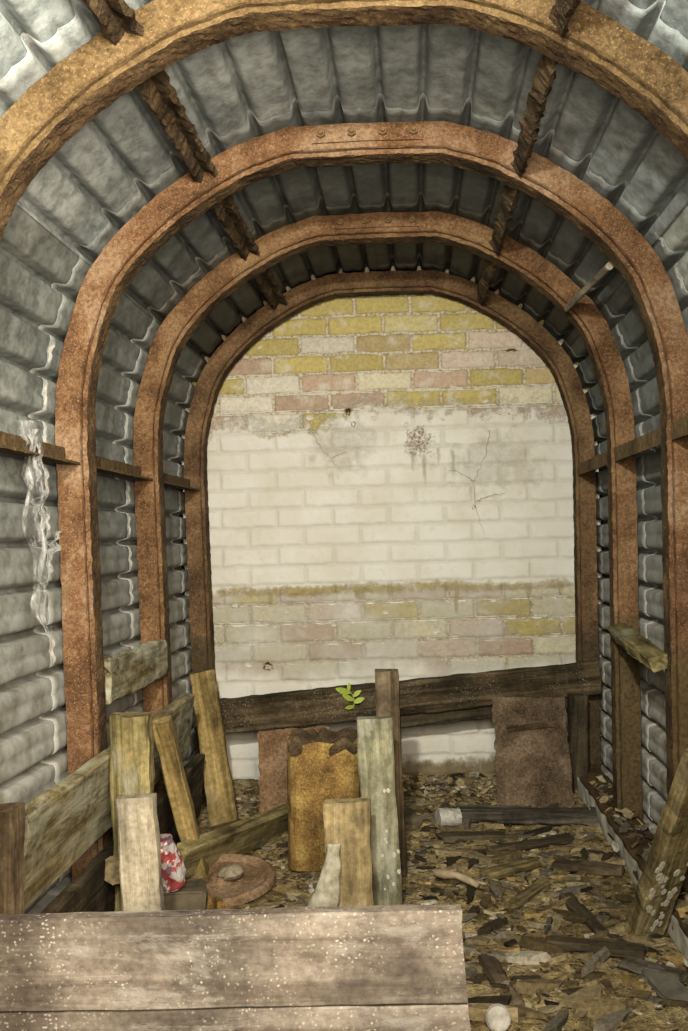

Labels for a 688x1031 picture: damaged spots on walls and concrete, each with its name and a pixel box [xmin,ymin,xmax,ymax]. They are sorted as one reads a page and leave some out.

peeling [209,294,566,437]
peeling [213,585,576,671]